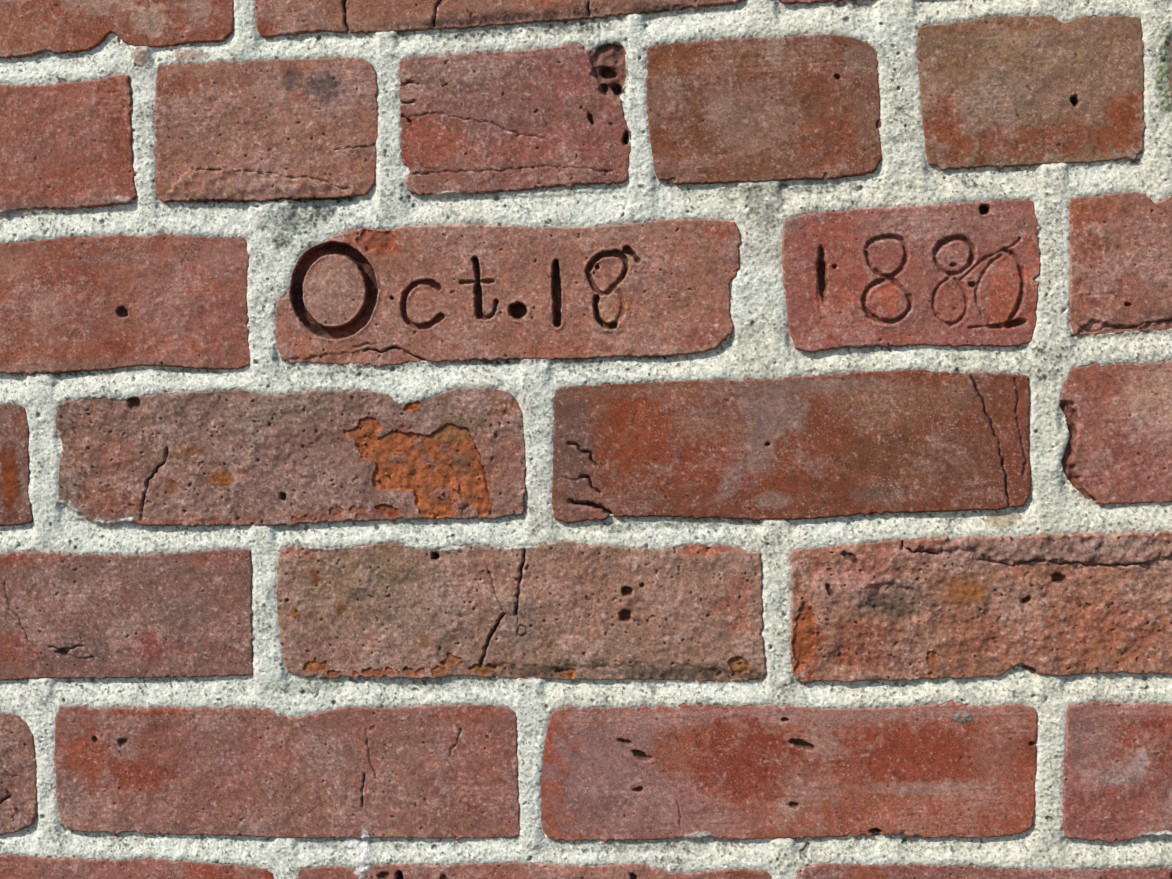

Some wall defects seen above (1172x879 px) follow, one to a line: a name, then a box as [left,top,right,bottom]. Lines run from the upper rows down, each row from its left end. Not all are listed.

crack [433,0,445,26]
crack [142,449,168,513]
spalling [329,400,491,520]
crack [563,443,612,514]
crack [972,376,1027,503]
crack [480,552,526,665]